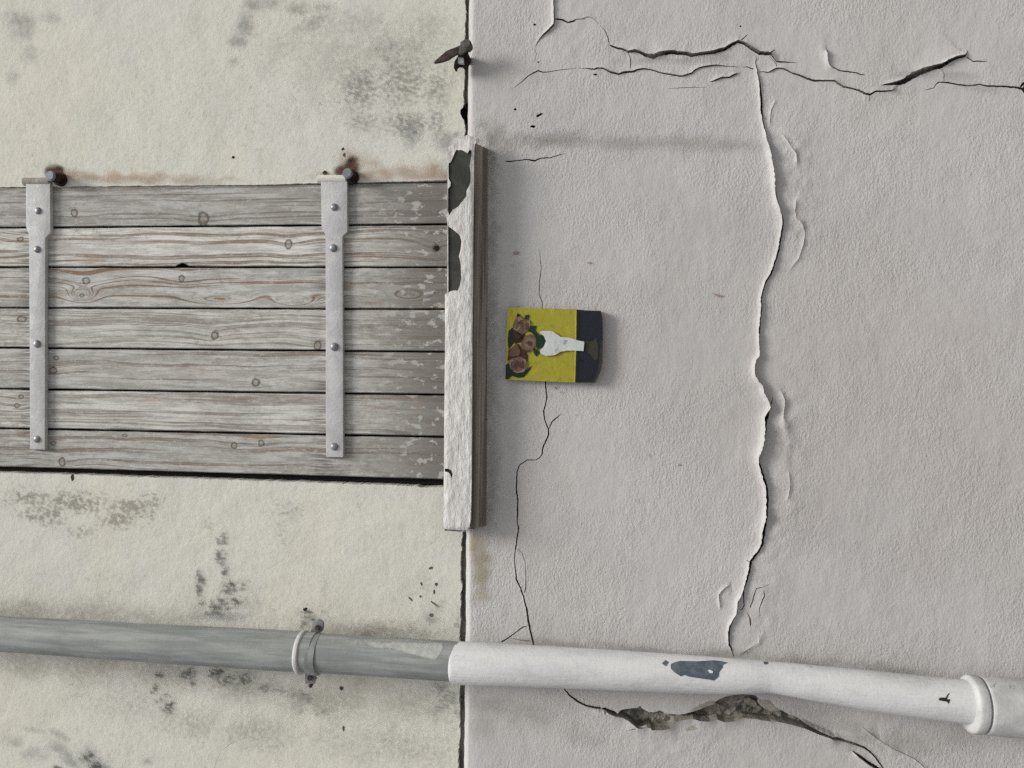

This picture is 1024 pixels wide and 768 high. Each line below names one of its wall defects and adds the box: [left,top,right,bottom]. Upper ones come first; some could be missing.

rust [323,157,357,175]
crack [505,153,564,162]
peeling [448,150,472,292]
crack [514,0,1024,656]
crack [501,381,561,645]
water stain [195,533,243,617]
water stain [209,667,250,687]
spalling [564,689,883,768]